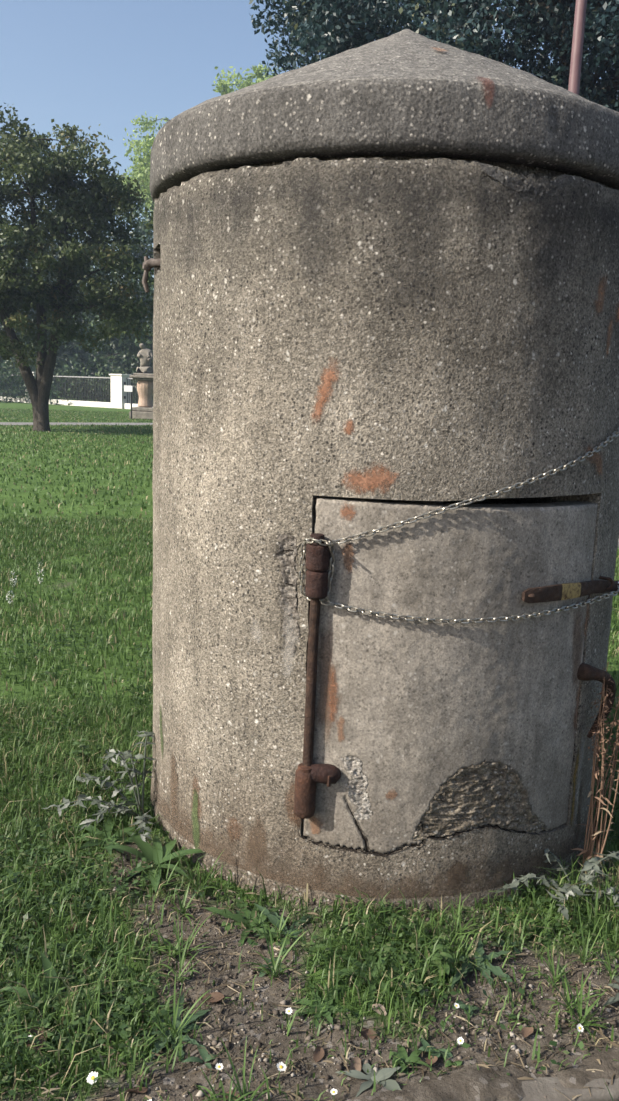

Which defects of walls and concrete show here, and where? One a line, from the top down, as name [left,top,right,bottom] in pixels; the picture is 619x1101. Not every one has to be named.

corrosion [313,369,337,417]
corrosion [340,505,356,520]
corrosion [343,544,354,571]
corrosion [328,671,344,740]
spalling [339,756,372,820]
crack [293,800,525,857]
spalling [413,760,547,841]